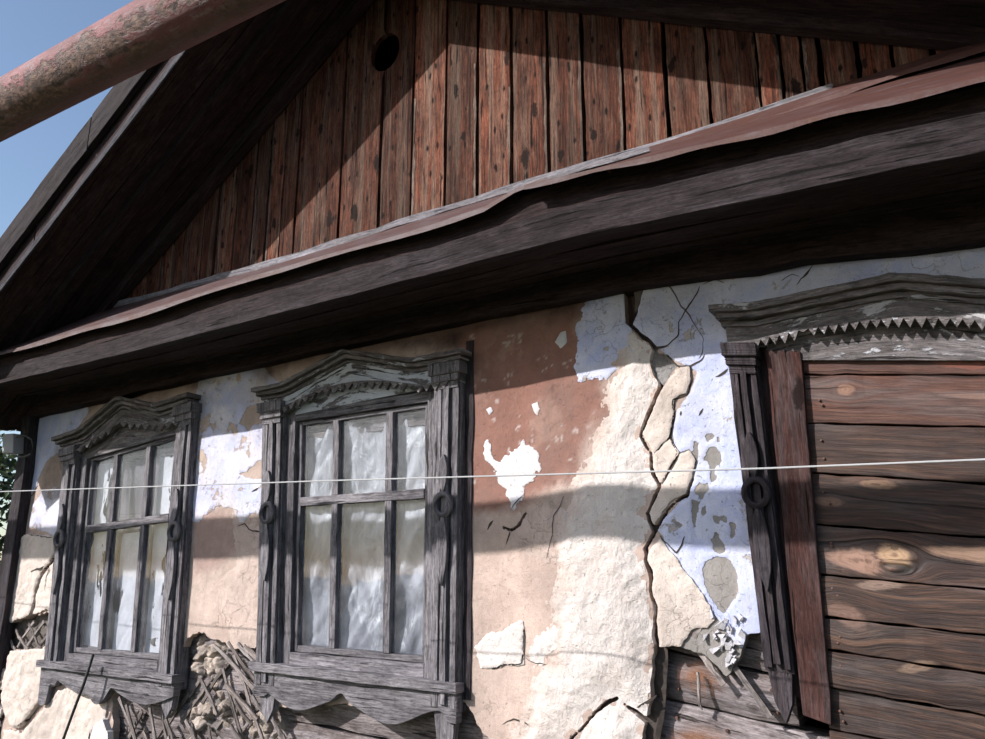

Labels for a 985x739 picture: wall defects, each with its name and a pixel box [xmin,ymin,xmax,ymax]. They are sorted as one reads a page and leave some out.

peeling [29,407,89,536]
peeling [192,368,279,649]
peeling [483,439,558,564]
crack [570,280,728,739]
peeling [555,247,985,648]